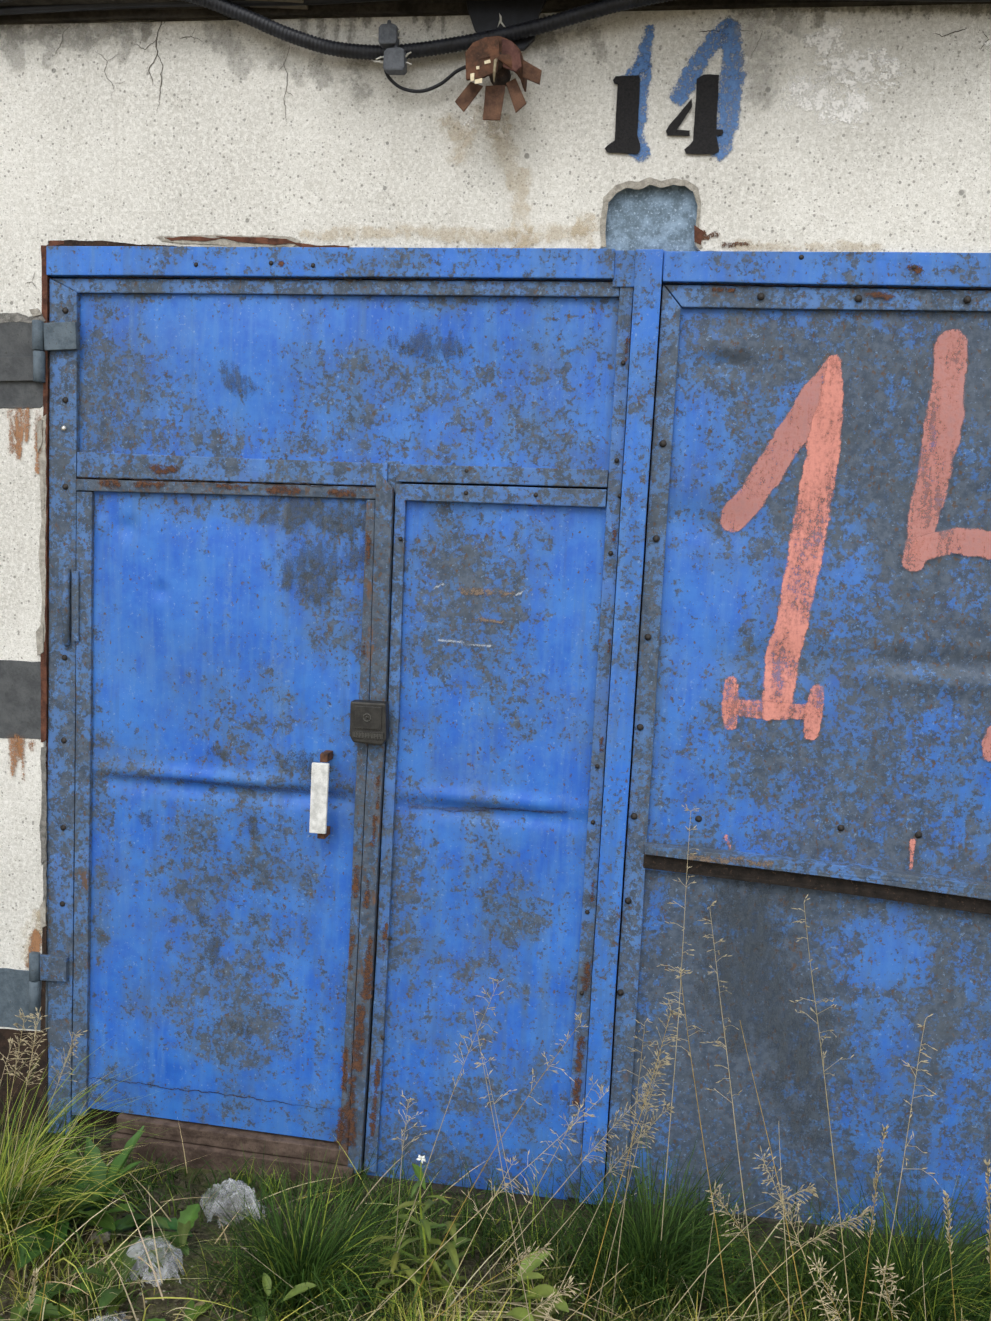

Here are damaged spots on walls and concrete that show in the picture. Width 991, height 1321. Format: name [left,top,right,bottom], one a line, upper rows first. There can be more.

crack [96,20,201,109]
rust [351,862,370,908]
rust [687,854,774,868]
rust [335,923,388,1146]